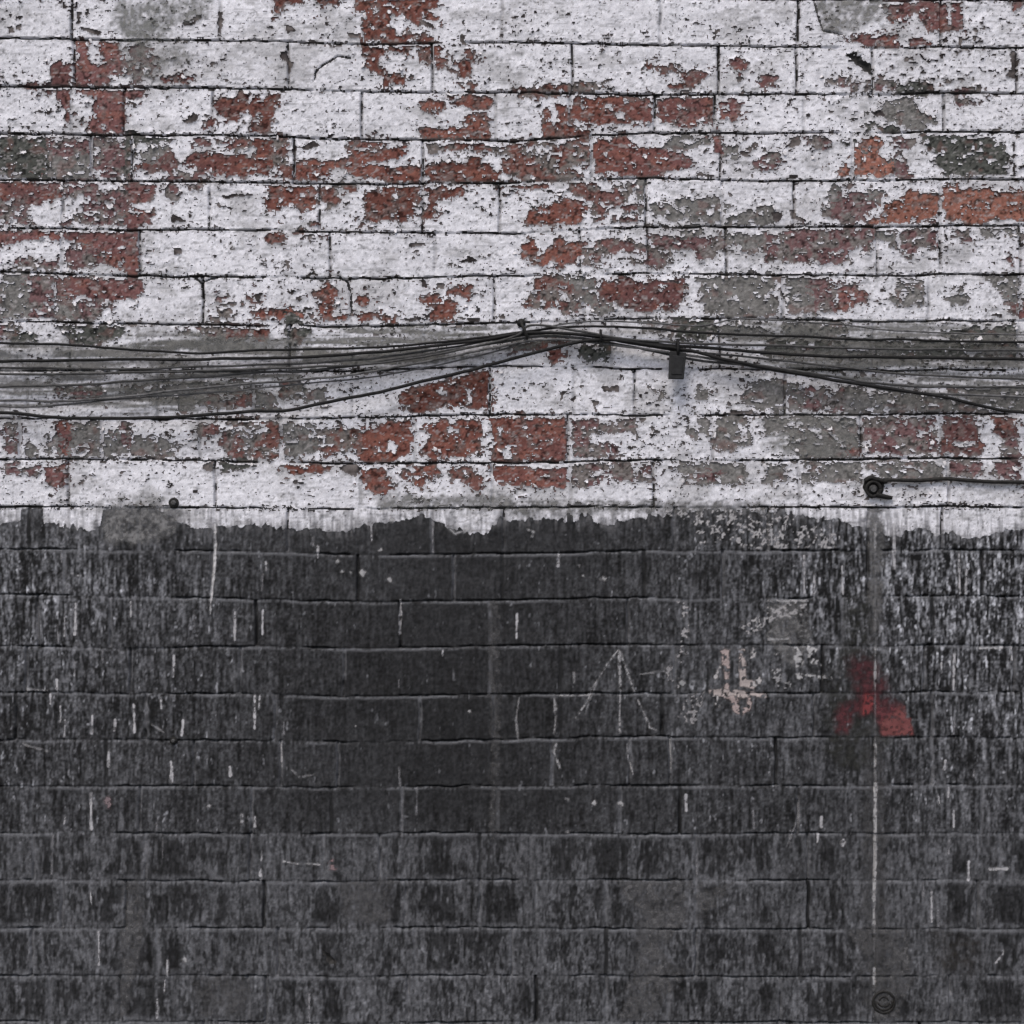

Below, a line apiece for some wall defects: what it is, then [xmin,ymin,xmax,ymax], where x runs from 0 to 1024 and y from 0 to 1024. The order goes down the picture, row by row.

peeling [0,0,1024,512]